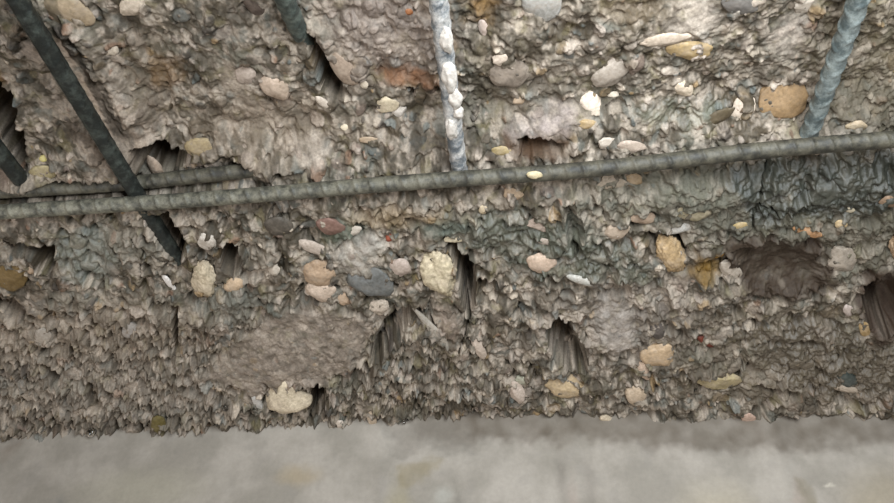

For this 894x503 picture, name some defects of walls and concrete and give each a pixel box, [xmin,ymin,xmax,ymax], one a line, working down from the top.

spalling [0,0,894,204]
spalling [0,131,894,461]